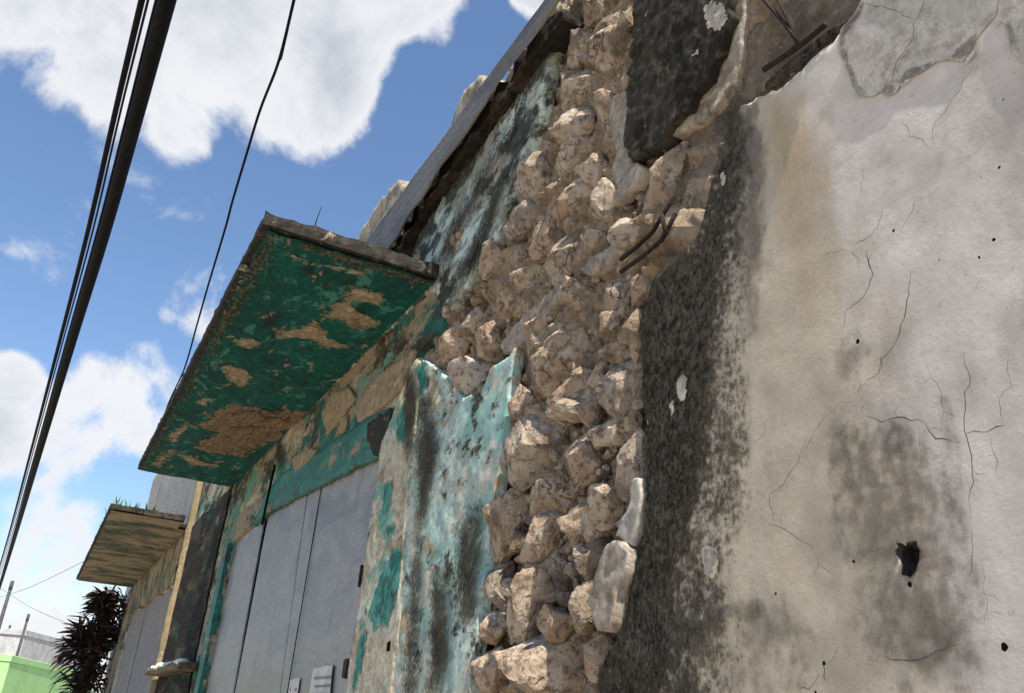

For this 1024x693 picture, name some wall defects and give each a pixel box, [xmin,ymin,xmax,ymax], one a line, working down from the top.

water stain [765,21,847,93]
crack [900,53,984,148]
spalling [152,397,307,468]
peeling [219,365,254,389]
water stain [143,99,526,470]
mould [400,364,483,693]
spalling [233,0,1024,693]
water stain [597,101,798,693]
crack [822,201,915,326]
crack [757,275,1012,620]
water stain [838,427,961,671]
crack [884,644,959,662]